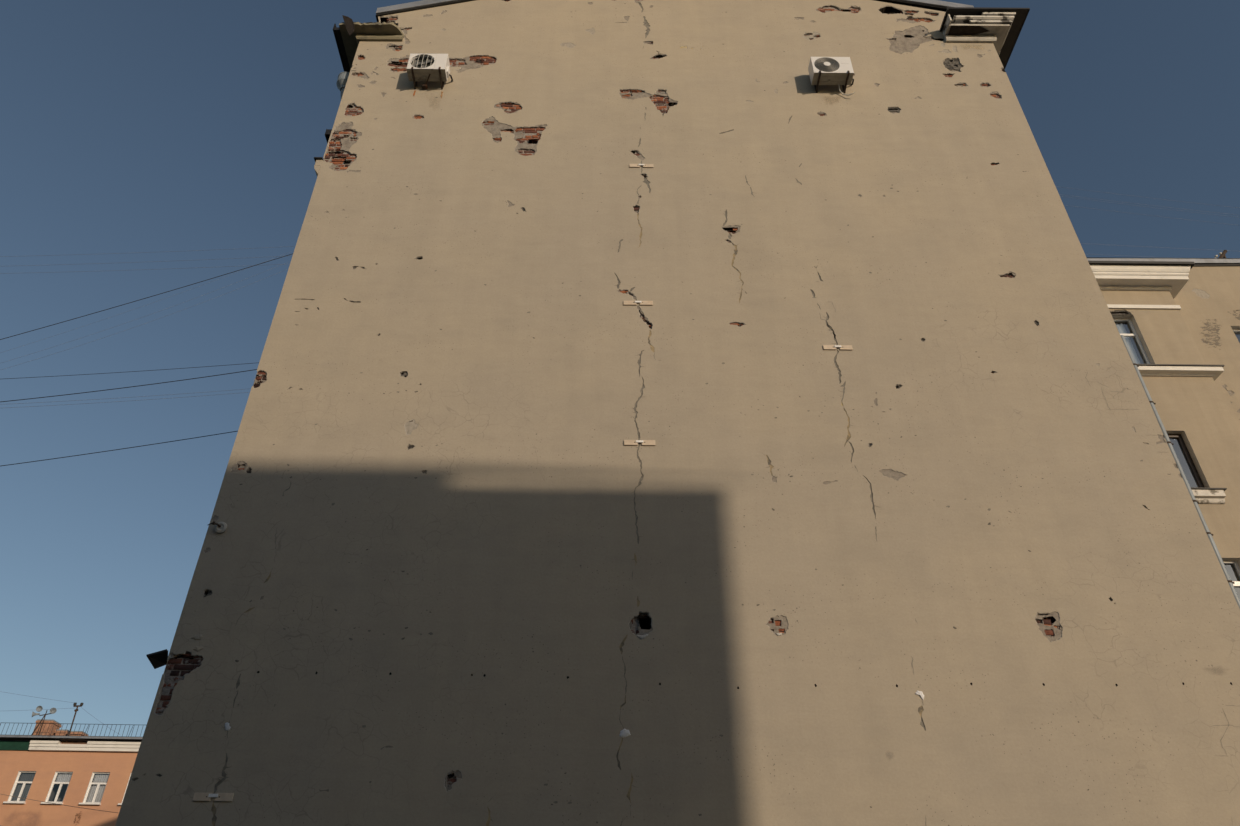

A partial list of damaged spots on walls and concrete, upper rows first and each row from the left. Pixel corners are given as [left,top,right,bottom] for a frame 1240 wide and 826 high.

crack [638,2,659,53]
peeling [878,5,945,54]
flaking render [323,15,412,187]
flaking render [481,101,547,156]
flaking render [619,89,678,114]
crack [615,107,664,293]
crack [723,175,755,303]
crack [810,265,881,540]
crack [631,330,661,606]
flaking render [154,651,204,716]
spalling [1035,611,1063,642]
crack [211,674,241,826]